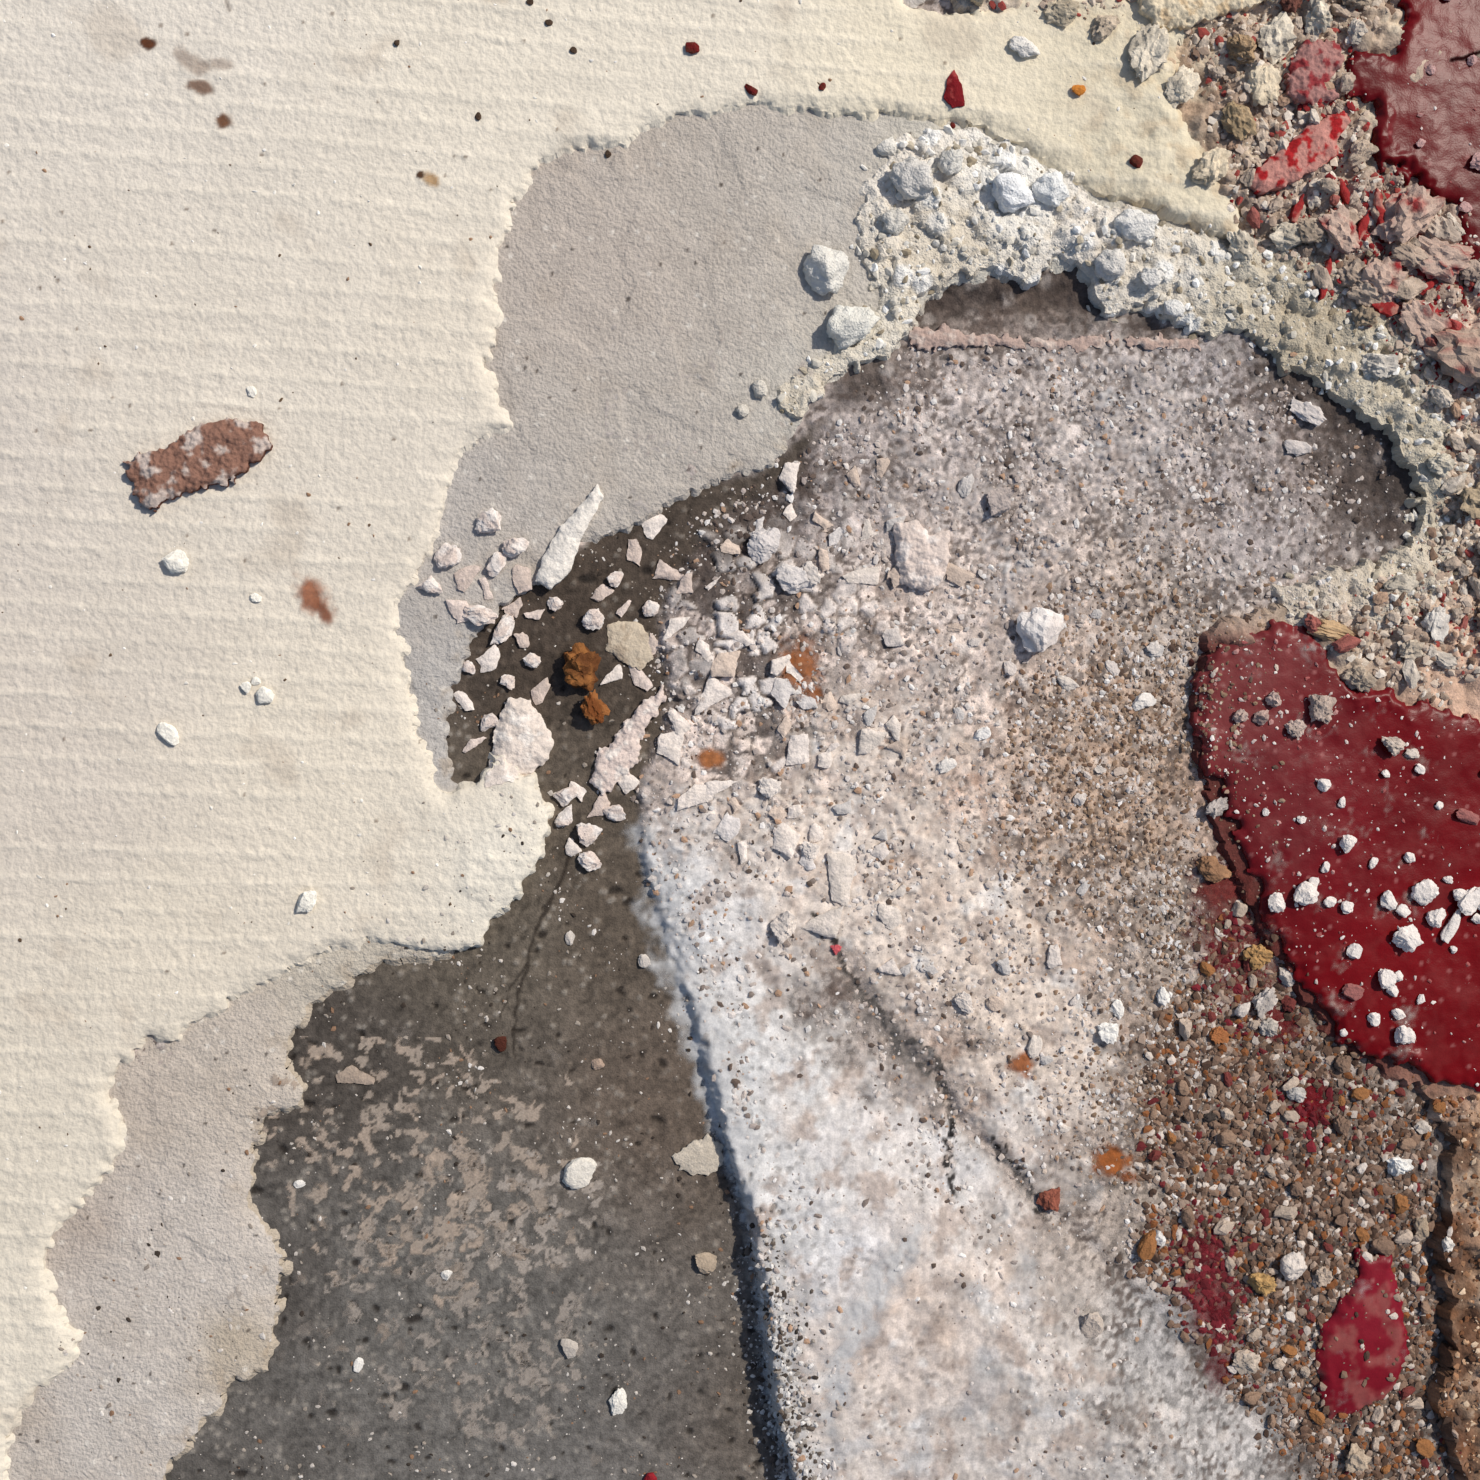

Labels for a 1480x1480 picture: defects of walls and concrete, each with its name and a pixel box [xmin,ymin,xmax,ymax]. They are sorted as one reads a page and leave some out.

peeling [1129,154,1143,168]
spalling [1168,0,1419,262]
peeling [395,70,1048,795]
spalling [1188,603,1288,712]
spalling [1313,379,1480,723]
peeling [7,938,455,1480]
flaking render [562,1157,597,1189]
flaking render [672,1133,724,1176]
crack [811,913,955,1195]
crack [991,1136,1051,1221]
spalling [1191,736,1480,1480]
flaking render [609,1388,627,1416]